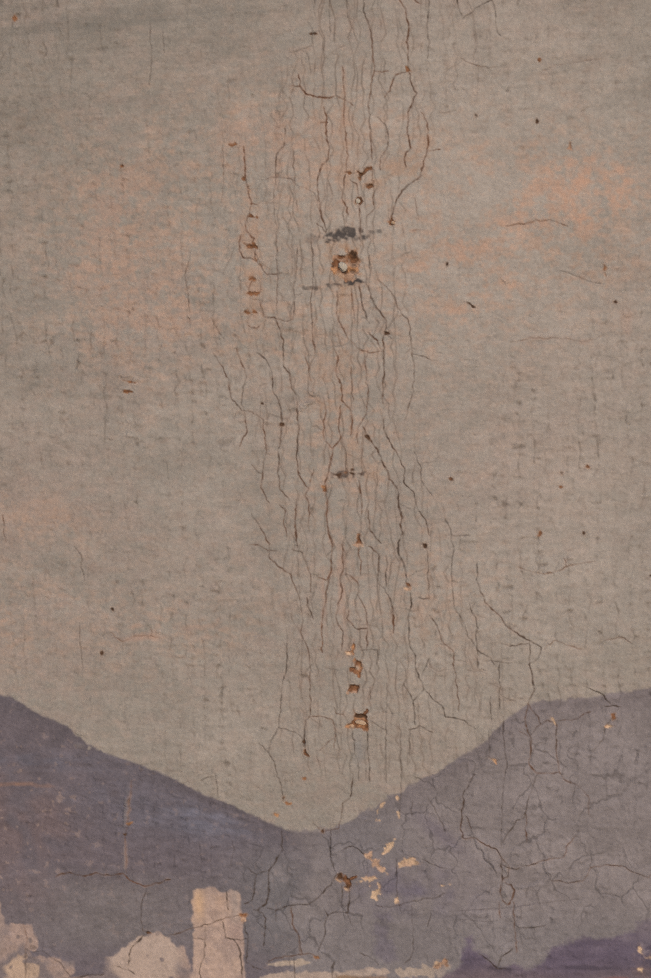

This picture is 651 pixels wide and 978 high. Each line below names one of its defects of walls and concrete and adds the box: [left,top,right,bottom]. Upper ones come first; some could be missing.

hole [329,248,361,272]
crack [168,0,651,978]
hole [342,637,372,733]
crack [22,779,171,978]
spalling [333,835,425,906]
peeling [636,942,651,975]